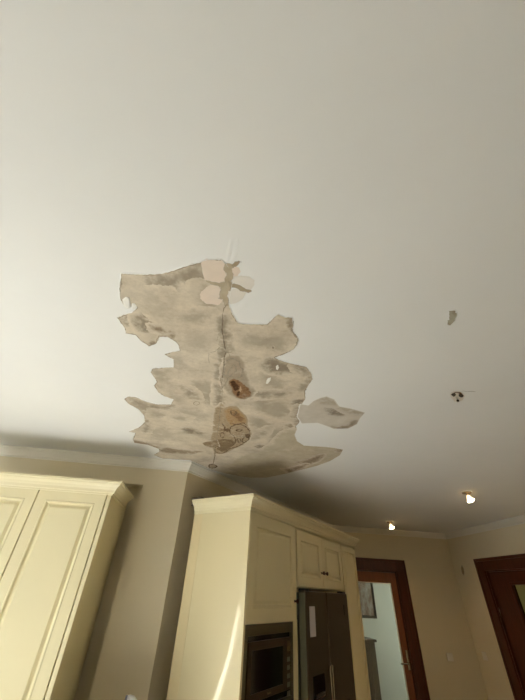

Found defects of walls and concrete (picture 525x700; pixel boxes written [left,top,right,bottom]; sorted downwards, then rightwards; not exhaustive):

peeling [116,258,313,478]
crack [207,261,251,383]
corrosion [202,353,258,468]
leakage [119,263,365,478]
peeling [446,309,458,326]